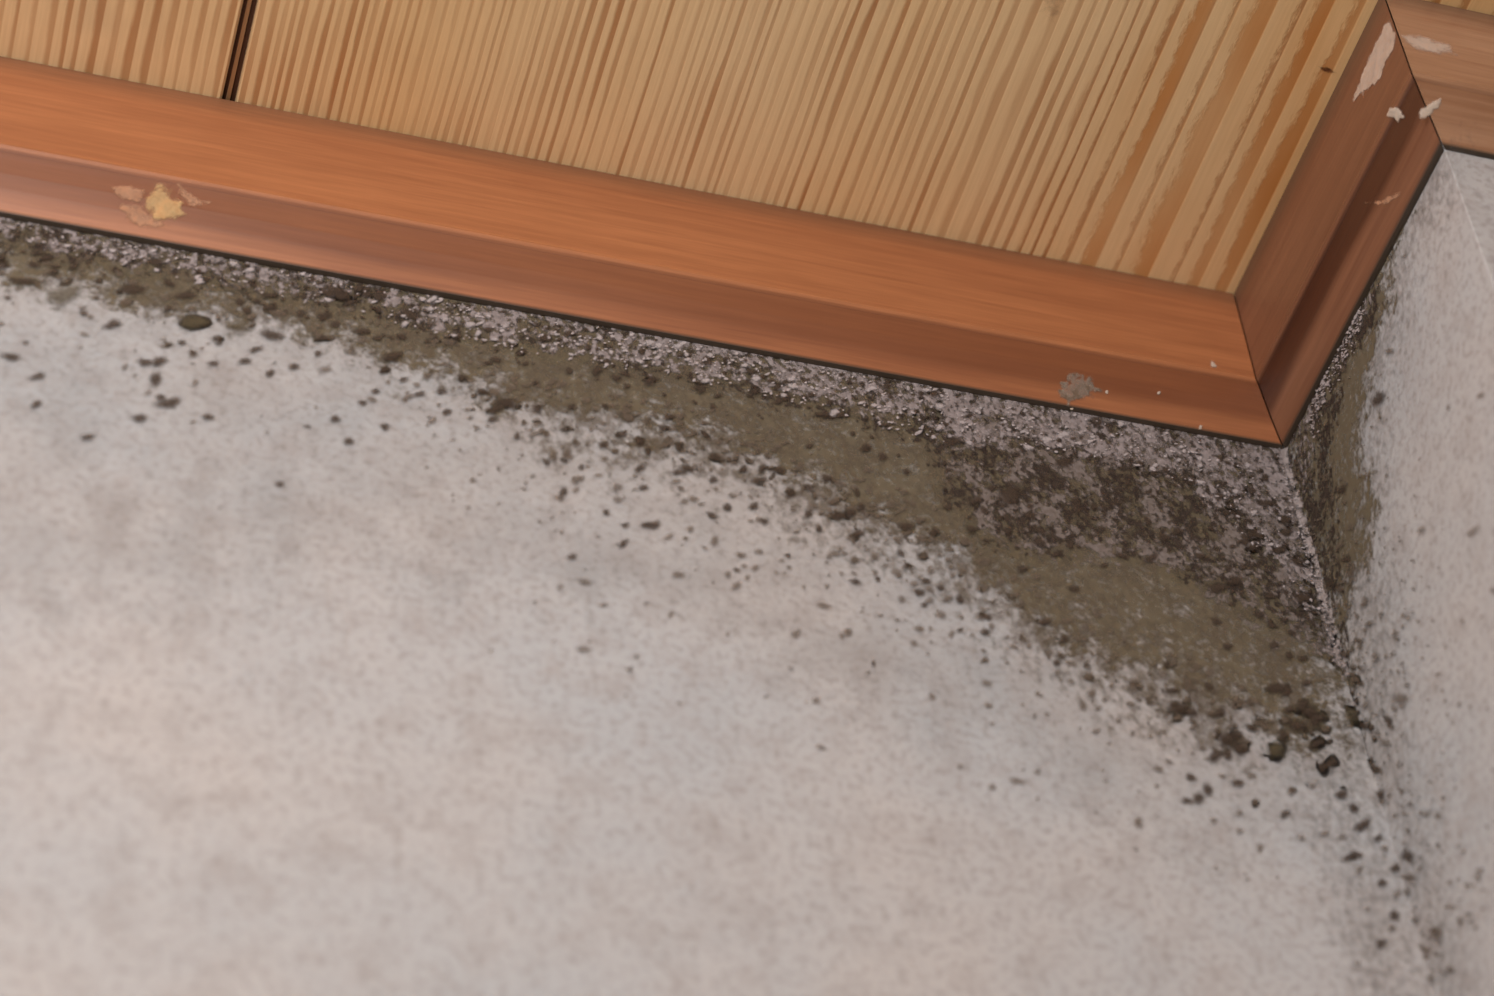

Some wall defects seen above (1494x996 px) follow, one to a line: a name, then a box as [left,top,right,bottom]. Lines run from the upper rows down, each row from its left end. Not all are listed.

water stain [0,210,1494,991]